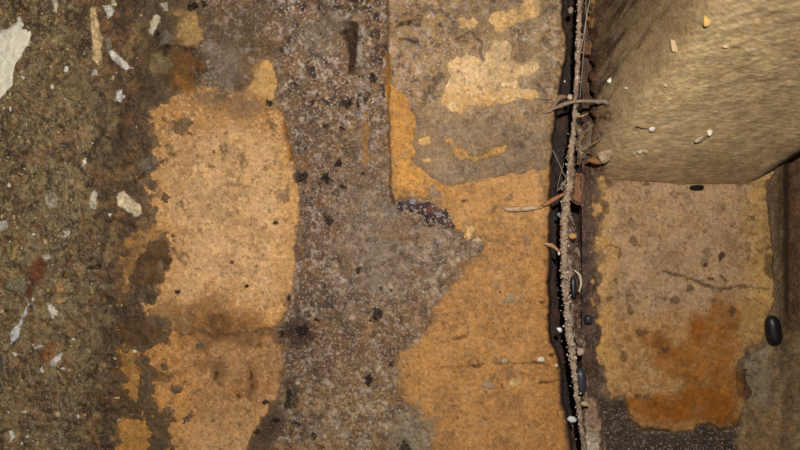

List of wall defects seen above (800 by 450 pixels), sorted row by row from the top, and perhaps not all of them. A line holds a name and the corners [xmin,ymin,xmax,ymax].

spalling [115,59,300,450]
leakage [284,382,300,426]
leakage [293,171,308,183]
spalling [385,81,573,450]